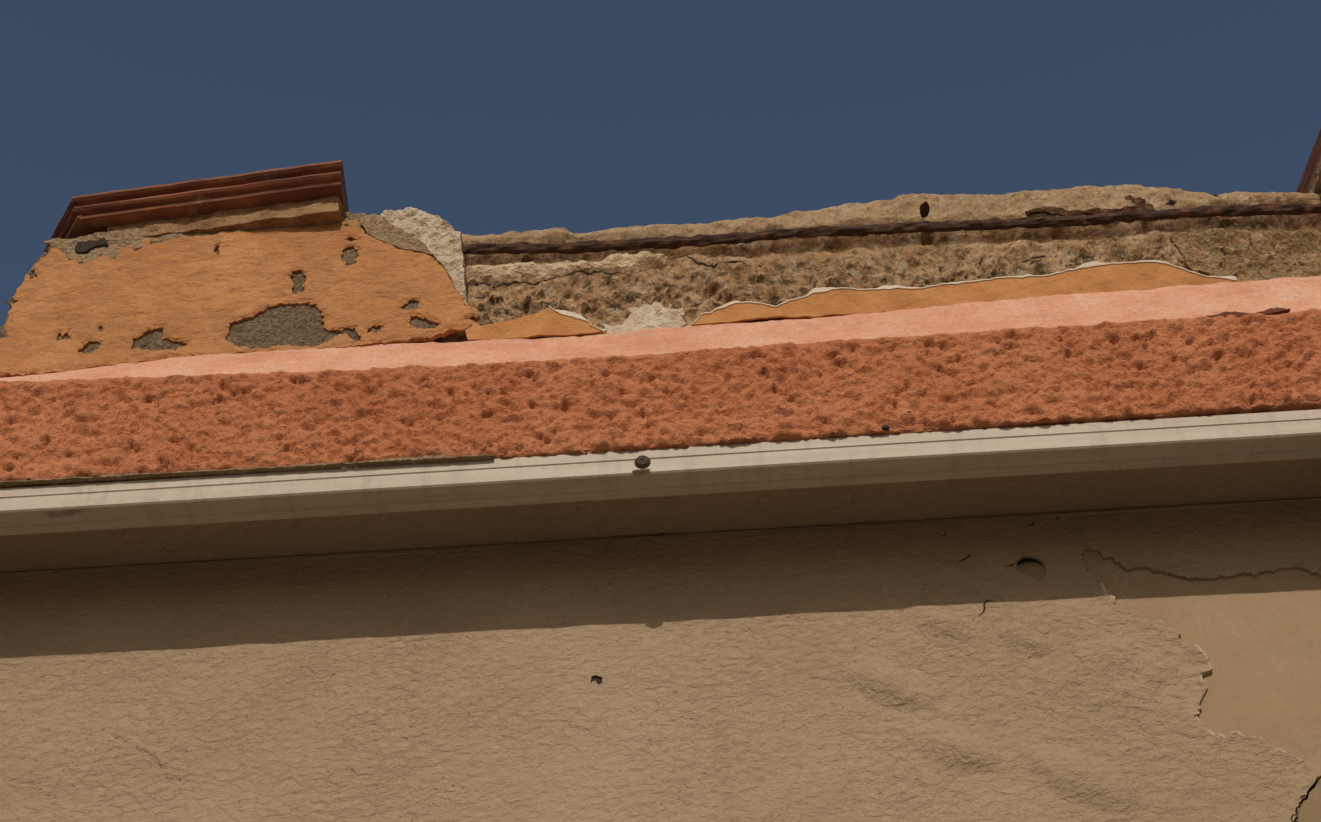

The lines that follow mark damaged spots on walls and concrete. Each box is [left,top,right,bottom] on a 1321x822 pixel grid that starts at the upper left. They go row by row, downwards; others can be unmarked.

spalling [43,225,295,263]
spalling [342,184,1321,343]
peeling [226,272,381,349]
peeling [81,328,103,354]
peeling [132,330,186,351]
peeling [1083,551,1321,822]
crack [1291,777,1321,822]